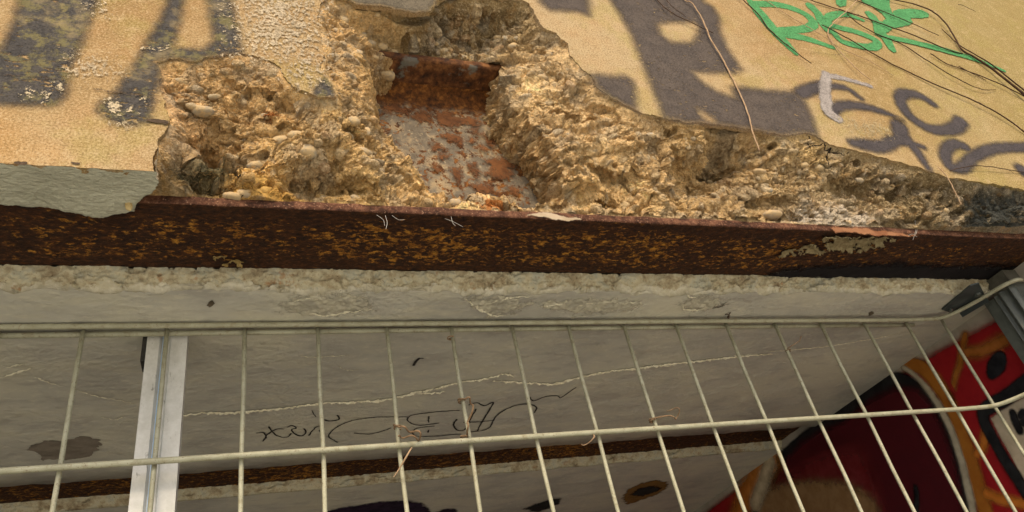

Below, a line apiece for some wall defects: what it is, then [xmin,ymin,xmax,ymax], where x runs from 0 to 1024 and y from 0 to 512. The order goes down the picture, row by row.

rust [381,103,523,211]
spalling [140,0,1024,258]
rust [213,256,244,268]
rust [830,226,914,237]
crack [183,332,904,417]